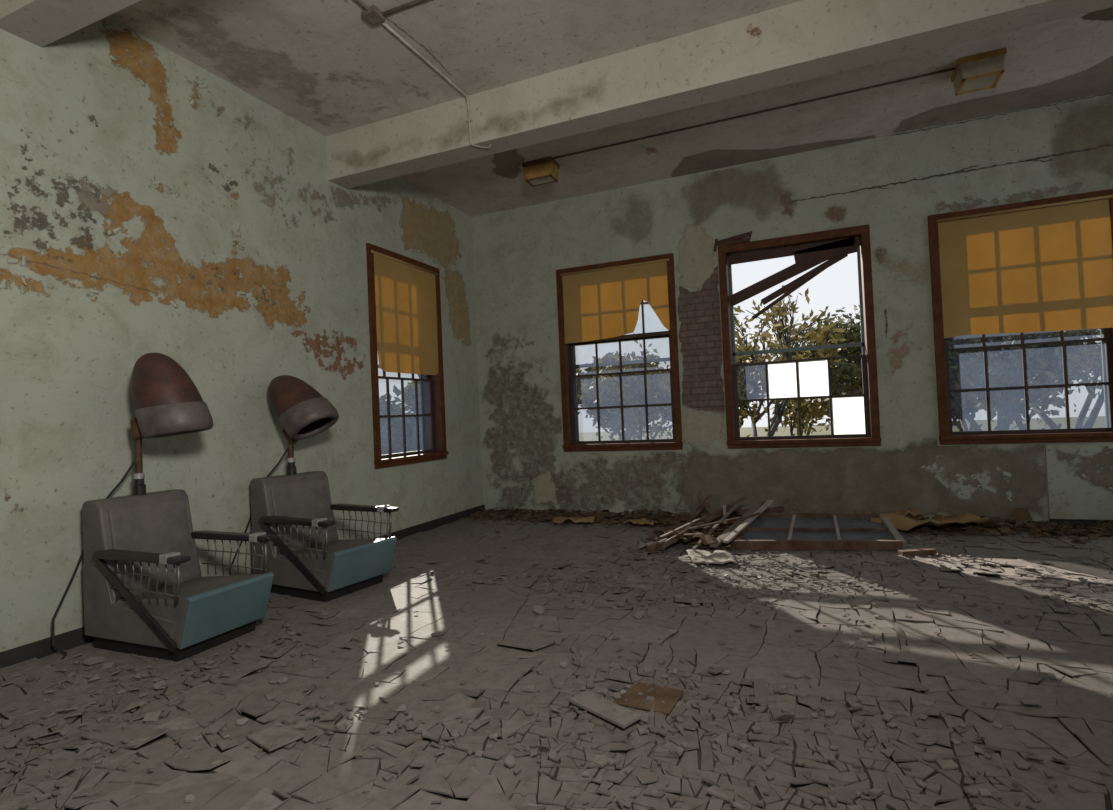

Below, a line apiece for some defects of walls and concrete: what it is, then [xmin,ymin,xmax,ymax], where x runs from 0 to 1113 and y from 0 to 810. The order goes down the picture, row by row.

peeling [98,17,182,155]
peeling [0,129,310,329]
peeling [202,148,471,346]
flaking render [714,231,752,252]
leakage [672,136,876,222]
leakage [894,56,1113,175]
leakage [483,335,697,514]
peeling [1058,446,1113,491]